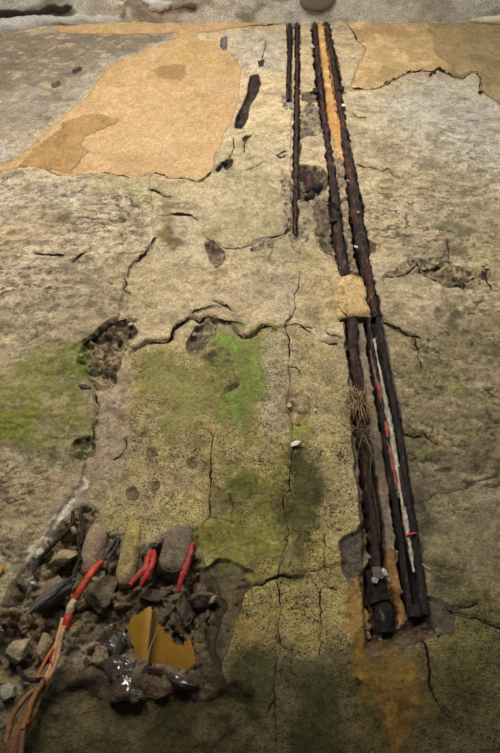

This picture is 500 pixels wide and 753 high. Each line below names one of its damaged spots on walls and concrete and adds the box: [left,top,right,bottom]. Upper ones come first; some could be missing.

peeling [0,0,284,182]
spalling [280,22,359,274]
crack [354,66,483,94]
crack [123,237,156,293]
spalling [382,250,491,290]
spalling [76,317,138,390]
crack [135,274,422,751]
spalling [0,501,256,728]
rust [347,580,416,729]